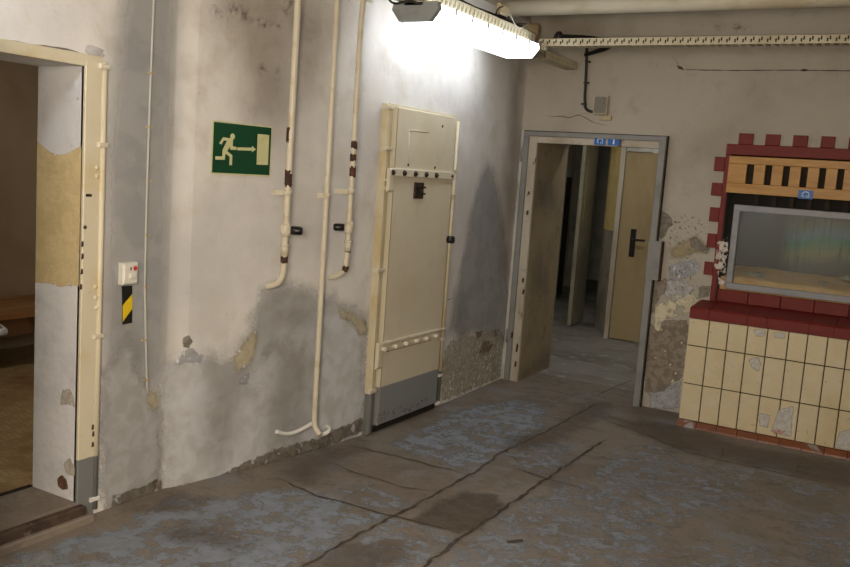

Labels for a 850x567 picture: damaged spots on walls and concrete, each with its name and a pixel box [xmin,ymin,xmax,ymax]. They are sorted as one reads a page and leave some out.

crack [674,58,850,74]
damp [451,169,508,340]
peeling [714,241,728,285]
spalling [645,212,701,393]
peeling [176,336,203,365]
spalling [442,330,503,400]
spalling [57,459,75,490]
spalling [223,418,363,475]
peeling [384,401,569,474]
spalling [835,429,850,450]
peeling [4,479,453,567]
damp [417,492,501,532]